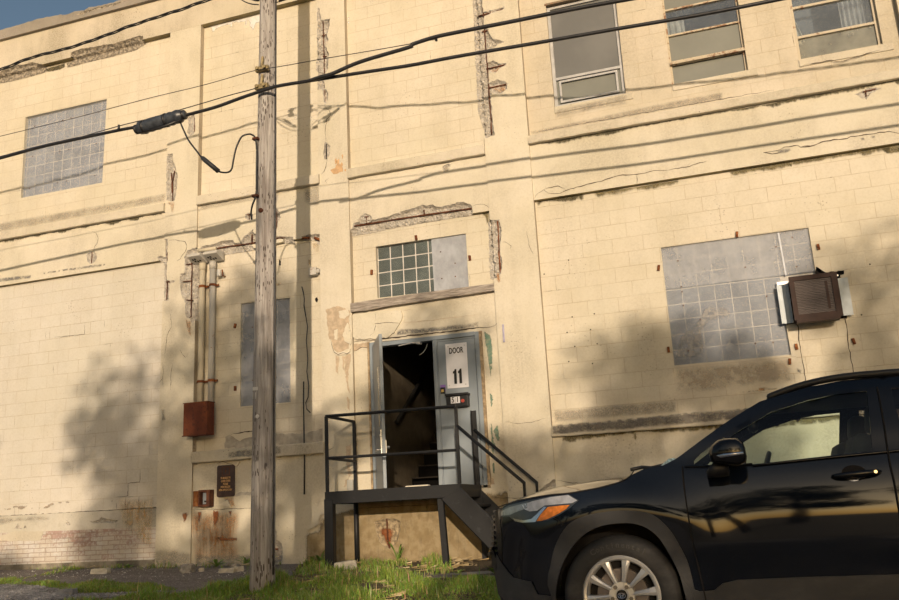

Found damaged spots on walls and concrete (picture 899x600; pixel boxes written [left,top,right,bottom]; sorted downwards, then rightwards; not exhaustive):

spalling [0,62,46,83]
spalling [66,35,146,67]
spalling [316,7,330,104]
spalling [473,0,508,138]
crack [763,131,899,154]
crack [539,161,706,194]
spalling [351,202,473,236]
spalling [158,213,256,326]
peeling [326,306,370,411]
corrosion [183,504,237,554]
peeling [303,501,325,561]
peeling [336,498,491,562]